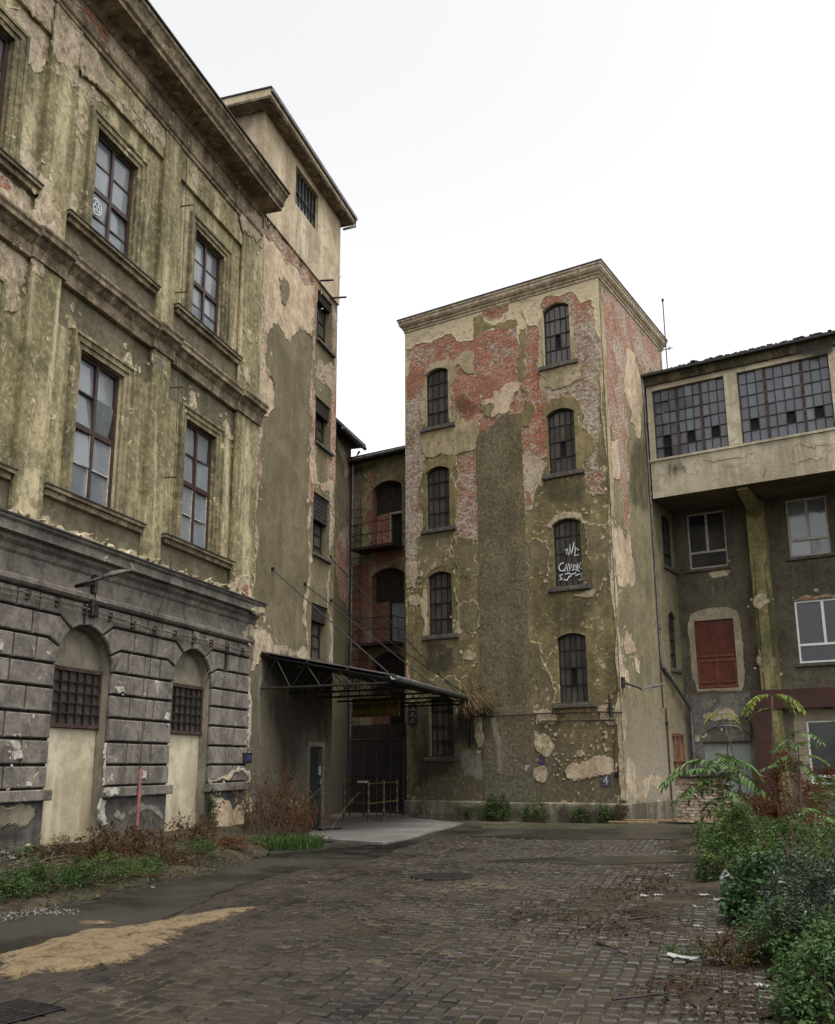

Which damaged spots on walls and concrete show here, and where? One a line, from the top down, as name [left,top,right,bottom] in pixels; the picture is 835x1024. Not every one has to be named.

peeling [7,203,350,833]
flaking render [405,282,668,803]